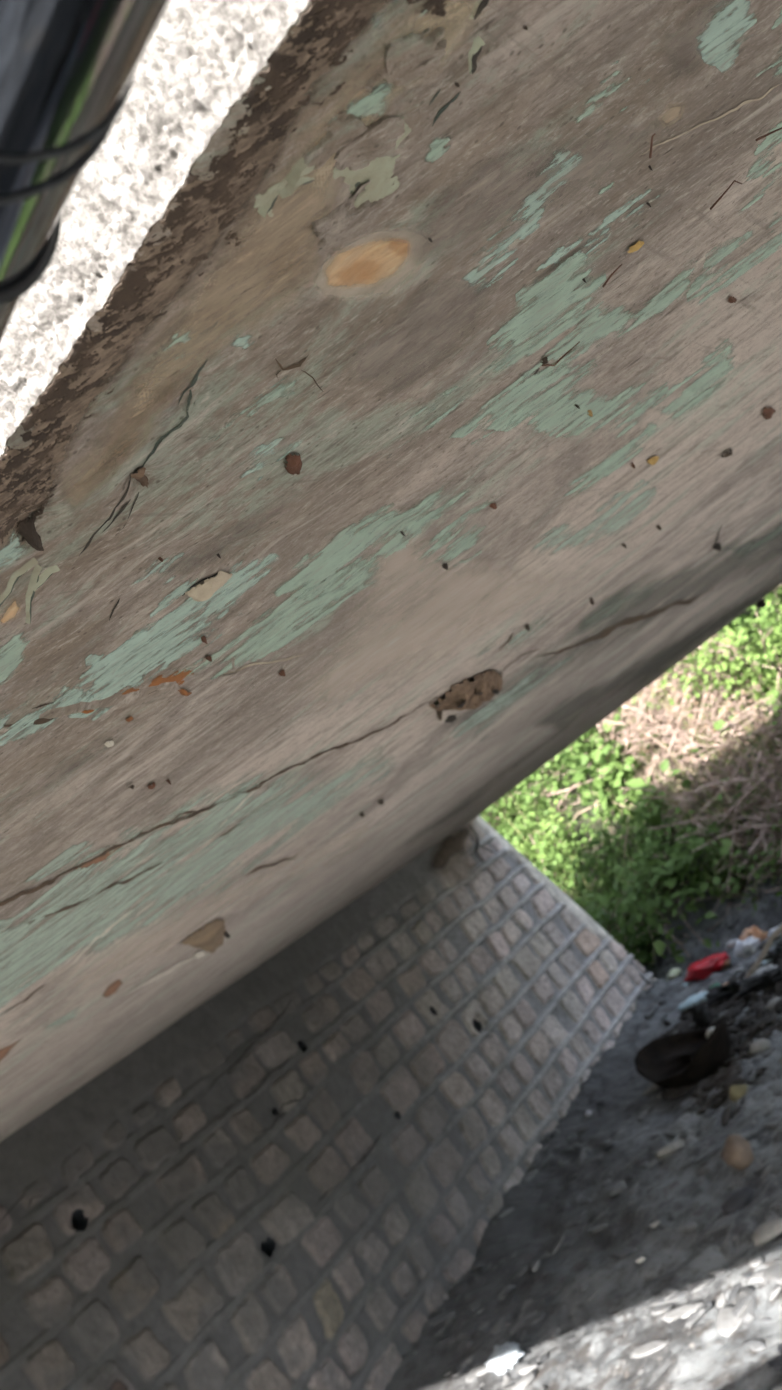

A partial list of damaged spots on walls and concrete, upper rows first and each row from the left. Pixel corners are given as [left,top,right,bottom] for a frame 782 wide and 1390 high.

spalling [0,0,309,455]
leakage [0,0,484,551]
peeling [254,10,447,256]
peeling [412,189,782,497]
crack [3,681,180,727]
crack [0,359,210,624]
peeling [0,749,395,1008]
crack [182,573,218,599]
crack [0,696,438,933]
peeling [0,488,491,746]
spalling [429,657,573,742]
crack [500,588,714,671]